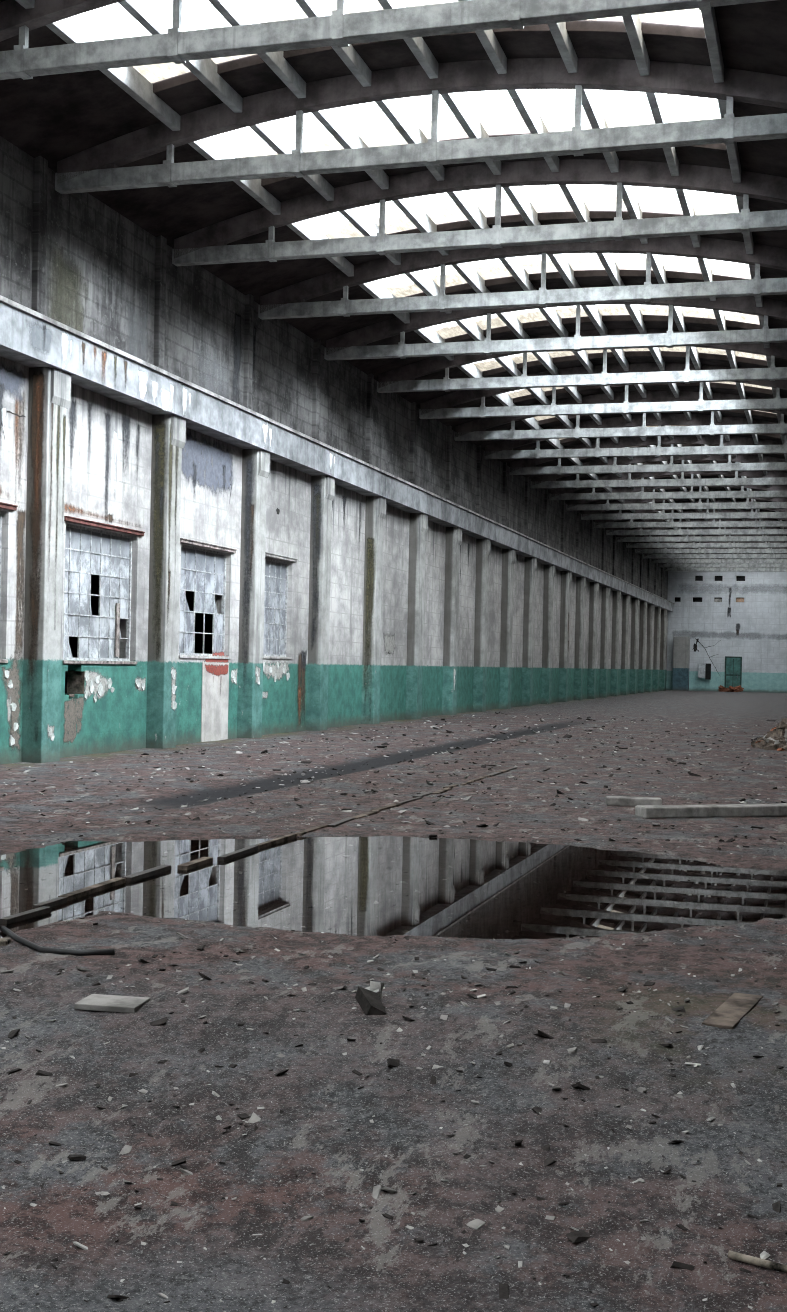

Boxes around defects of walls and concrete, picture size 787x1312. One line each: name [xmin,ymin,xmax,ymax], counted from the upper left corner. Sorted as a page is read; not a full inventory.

leakage [0,364,25,446]
leakage [29,324,72,359]
leakage [138,371,191,415]
leakage [233,314,256,401]
rust [8,372,128,739]
peeling [2,667,21,750]
spalling [48,664,114,743]
peeling [255,661,290,699]